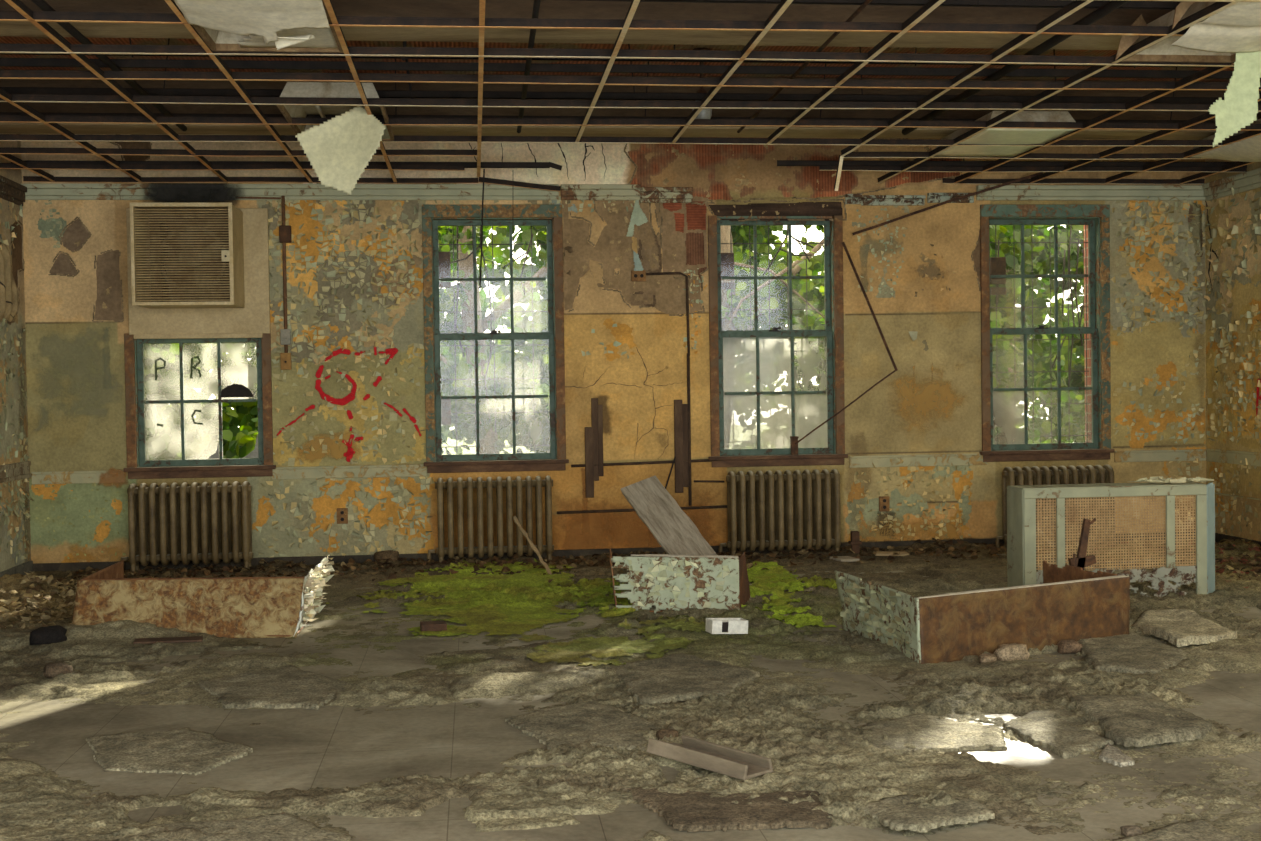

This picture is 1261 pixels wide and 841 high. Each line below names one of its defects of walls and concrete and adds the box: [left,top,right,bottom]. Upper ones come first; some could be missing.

peeling [0,198,127,565]
peeling [252,194,460,627]
peeling [581,318,637,361]
crack [565,347,683,458]
spalling [528,137,965,354]
peeling [845,460,973,542]
spalling [971,231,981,292]
peeling [1110,184,1261,540]